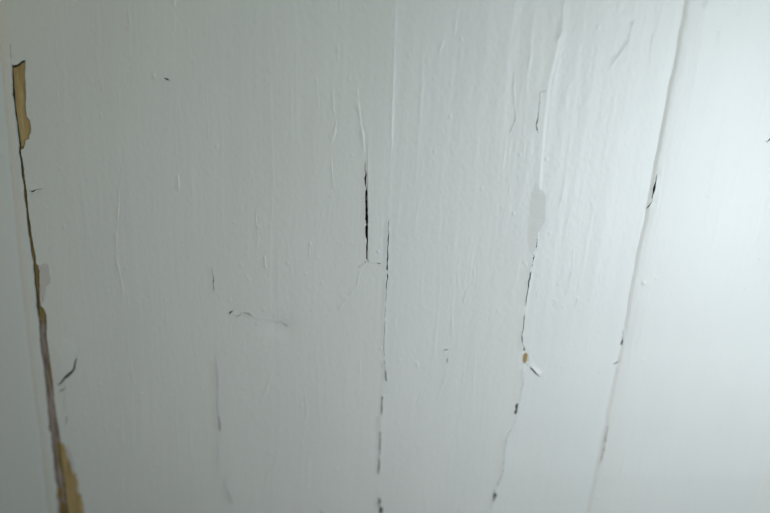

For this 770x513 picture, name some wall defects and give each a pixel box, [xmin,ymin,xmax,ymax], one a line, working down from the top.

peeling [38,263,51,304]
crack [514,229,544,380]